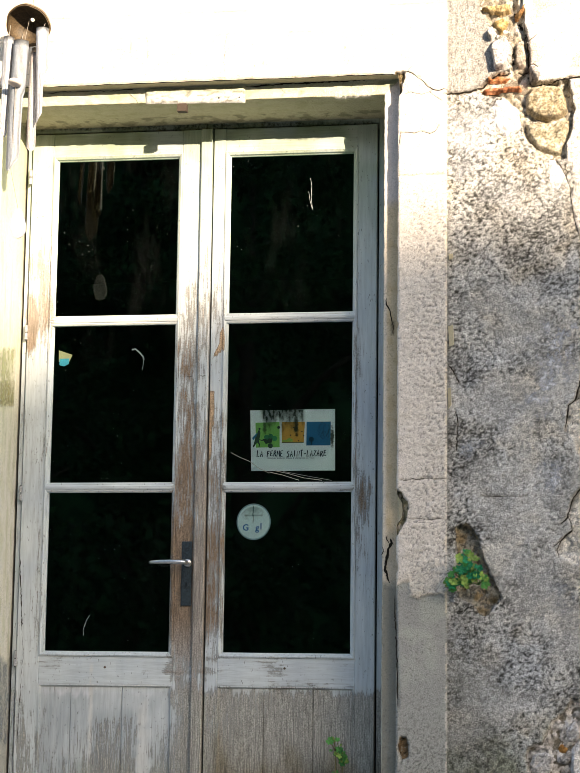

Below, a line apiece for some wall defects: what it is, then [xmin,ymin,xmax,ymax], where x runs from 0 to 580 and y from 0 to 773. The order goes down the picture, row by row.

spalling [477,0,574,189]
water stain [0,349,14,404]
crack [565,381,580,428]
crack [555,489,580,555]
spalling [455,523,500,617]
spalling [526,698,580,773]